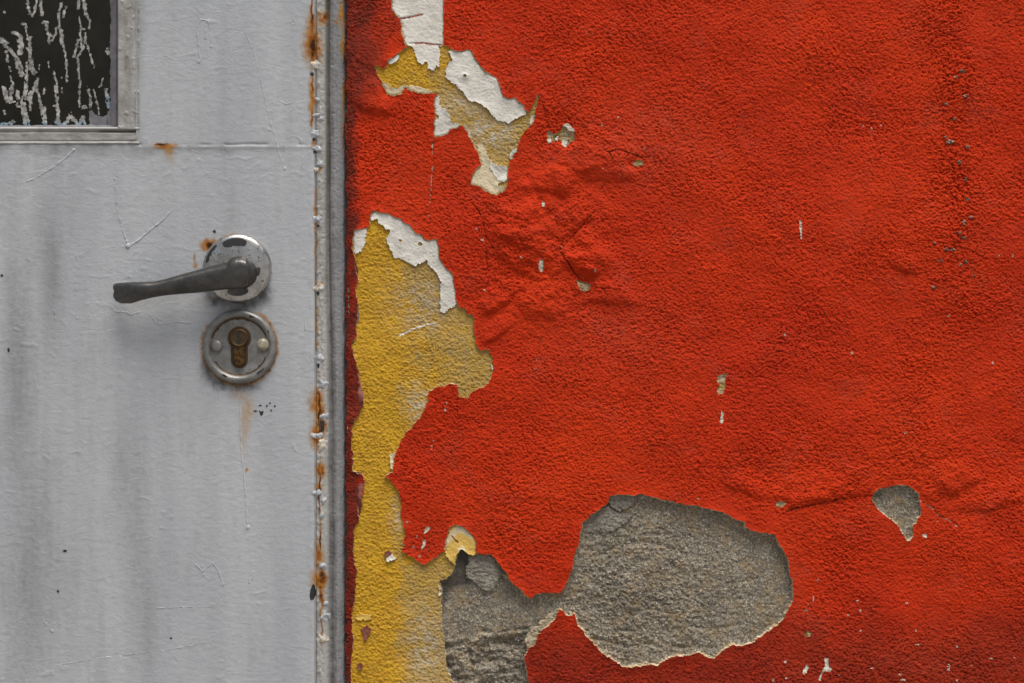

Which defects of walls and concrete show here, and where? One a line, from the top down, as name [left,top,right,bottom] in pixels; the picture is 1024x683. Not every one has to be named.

corrosion [304,0,345,62]
peeling [374,0,540,195]
peeling [547,123,575,147]
corrosion [310,392,326,446]
peeling [347,210,794,683]
crack [786,495,872,512]
spalling [871,484,927,541]
corrosion [313,530,327,636]